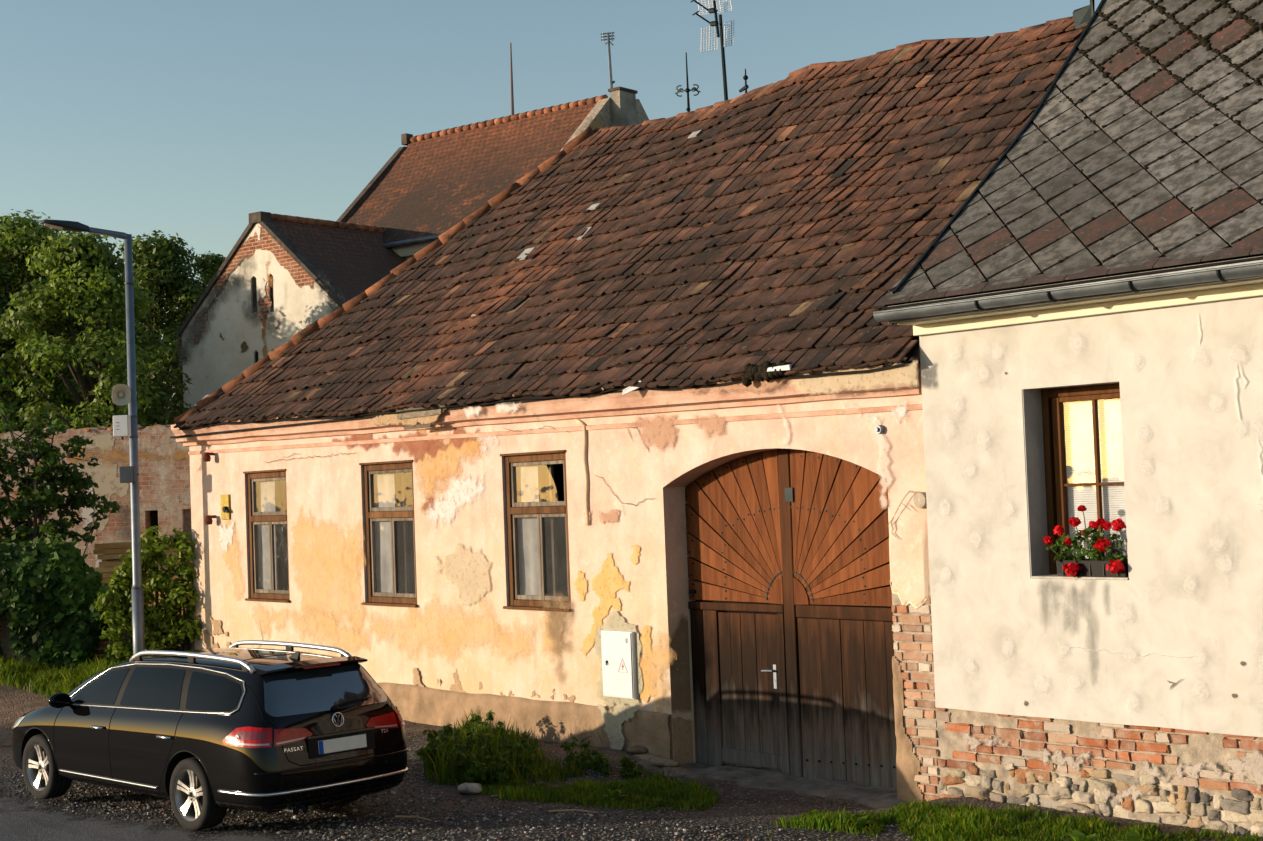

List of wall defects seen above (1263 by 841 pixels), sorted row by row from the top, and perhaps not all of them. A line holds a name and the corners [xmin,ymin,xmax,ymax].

spalling [215,226,314,297]
spalling [258,278,272,320]
crack [594,474,655,515]
peeling [434,543,491,606]
peeling [574,553,629,656]
peeling [638,625,656,702]
flaking render [891,585,1263,804]